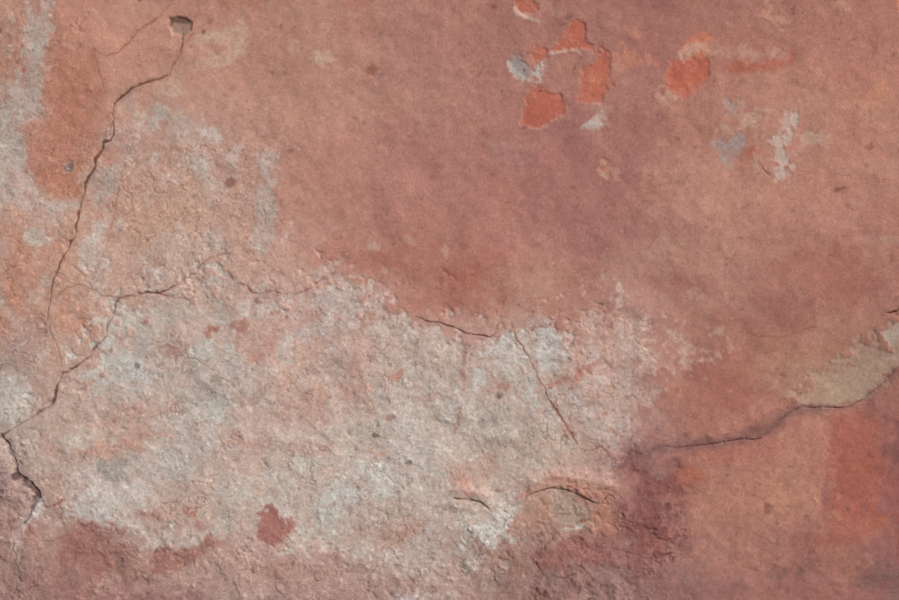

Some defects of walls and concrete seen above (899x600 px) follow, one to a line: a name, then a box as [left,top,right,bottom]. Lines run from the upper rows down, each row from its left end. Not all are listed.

peeling [511,0,542,25]
damp [0,0,63,215]
peeling [505,16,833,190]
damp [236,146,292,263]
damp [465,123,644,274]
damp [0,338,43,440]
crack [0,0,336,531]
crack [413,313,899,508]
spalling [760,313,899,416]
crack [883,304,899,318]
damp [3,495,120,562]
damp [138,512,243,555]